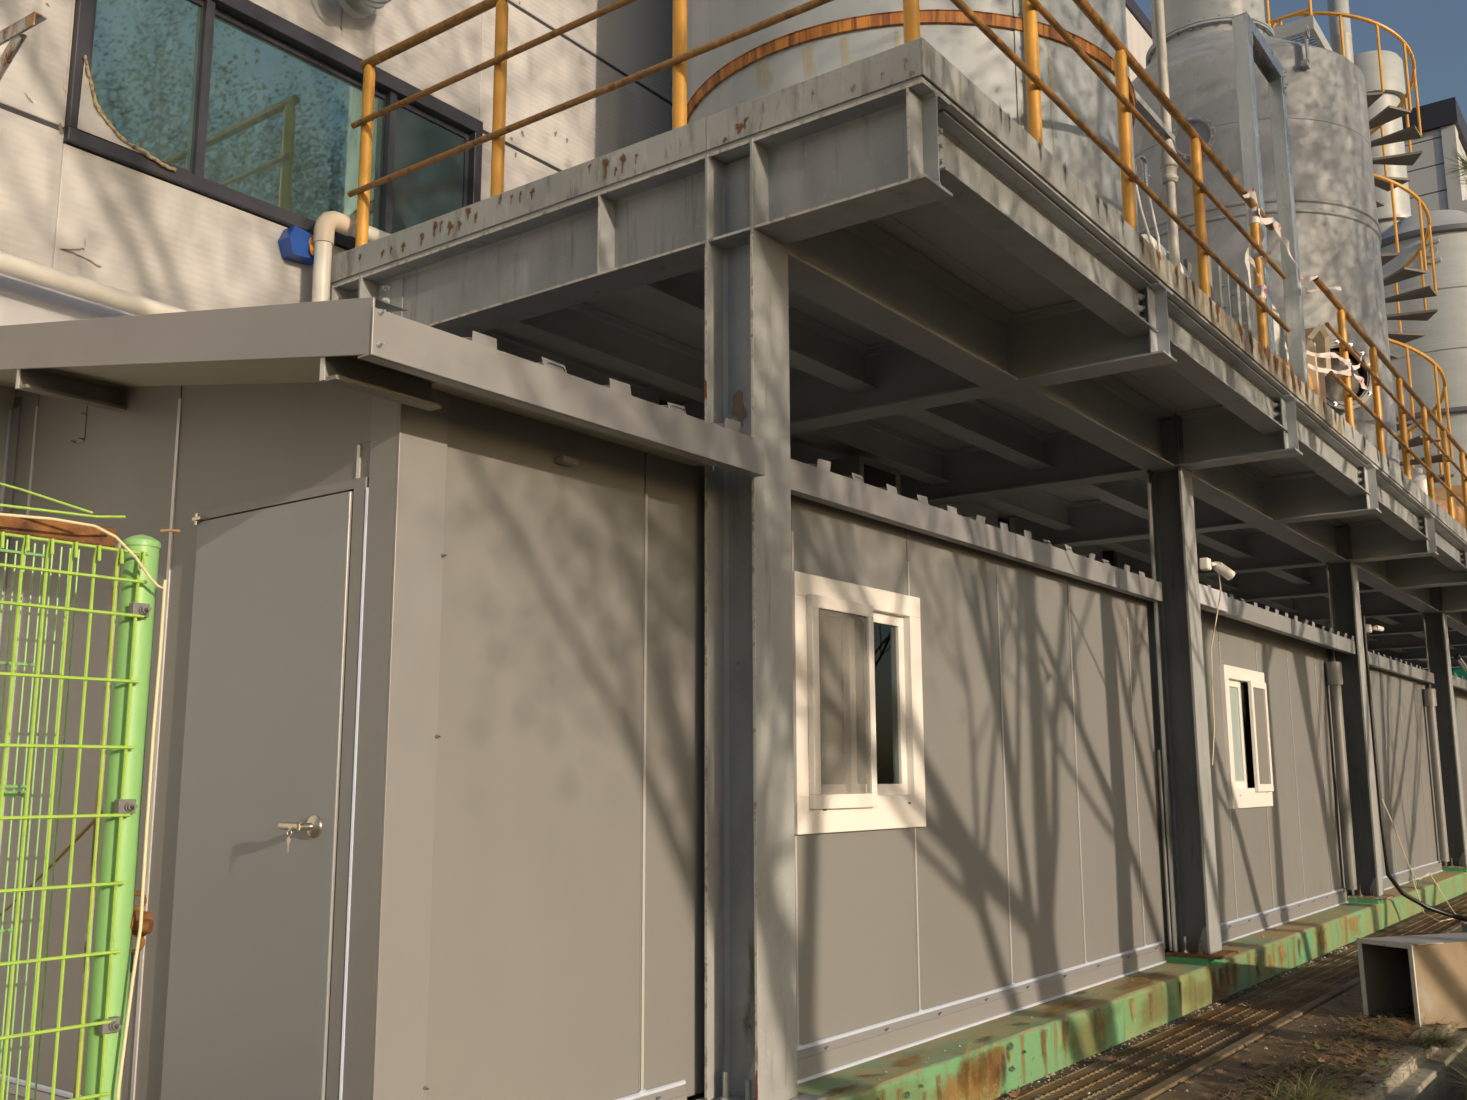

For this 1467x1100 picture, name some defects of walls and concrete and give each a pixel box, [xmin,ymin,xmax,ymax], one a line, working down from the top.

rust [588,154,638,179]
rust [381,208,477,258]
rust [1121,217,1220,323]
rust [1239,323,1403,481]
rust [1014,992,1087,1058]
rust [1123,973,1163,1018]
rust [829,1056,919,1100]
rust [924,1036,1010,1100]